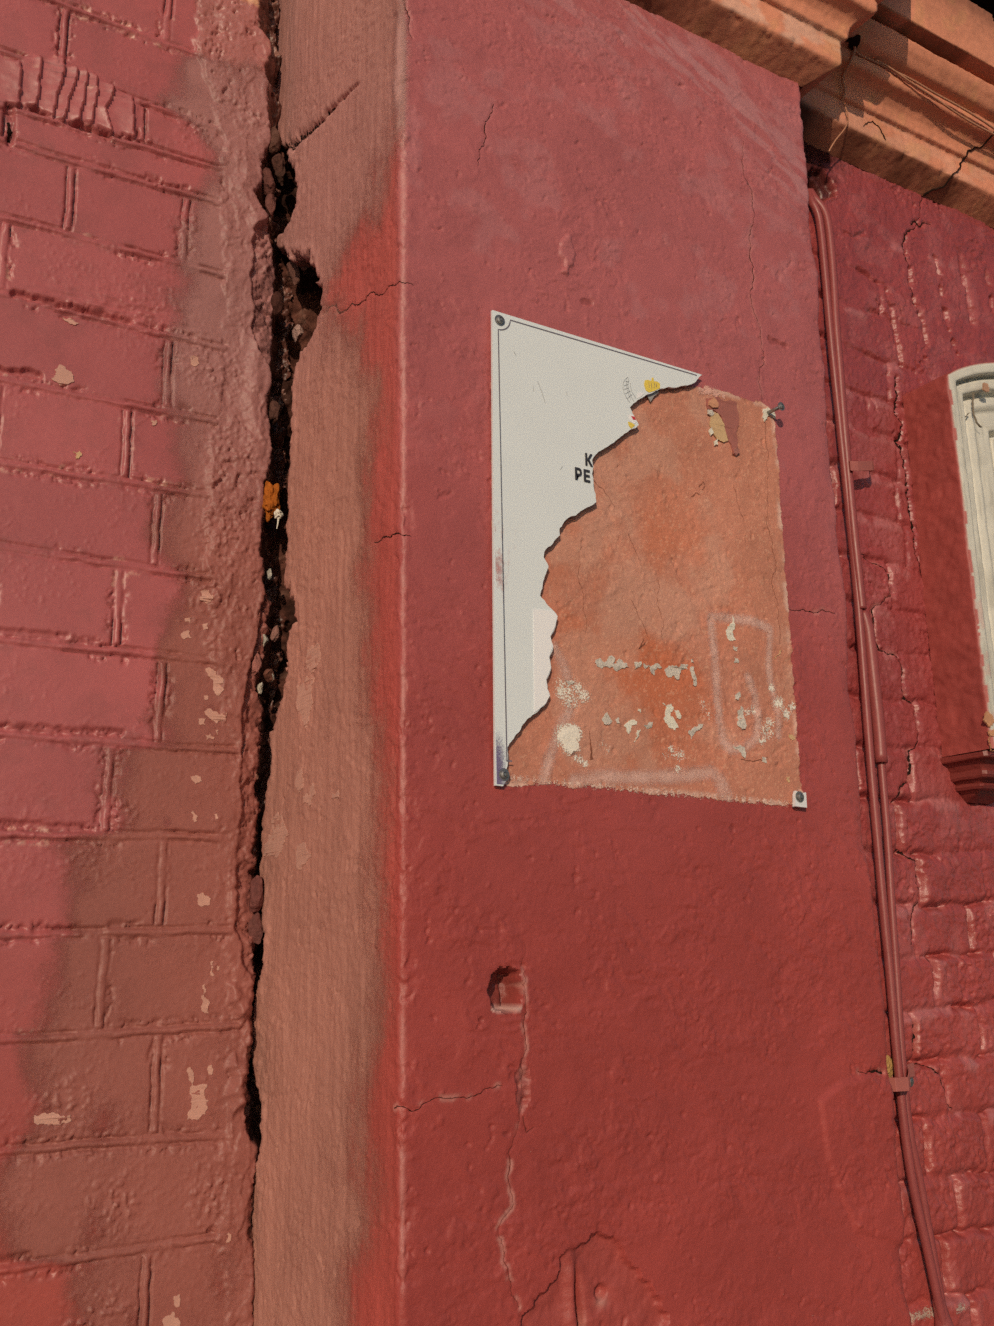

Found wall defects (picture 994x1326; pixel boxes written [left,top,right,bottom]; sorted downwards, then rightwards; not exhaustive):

crack [902,131,994,305]
crack [251,0,413,731]
crack [862,377,921,703]
crack [892,735,918,801]
crack [248,774,264,981]
crack [895,849,919,944]
spalling [478,966,524,1024]
crack [249,1068,272,1137]
crack [394,955,532,1307]
spalling [520,1231,670,1326]